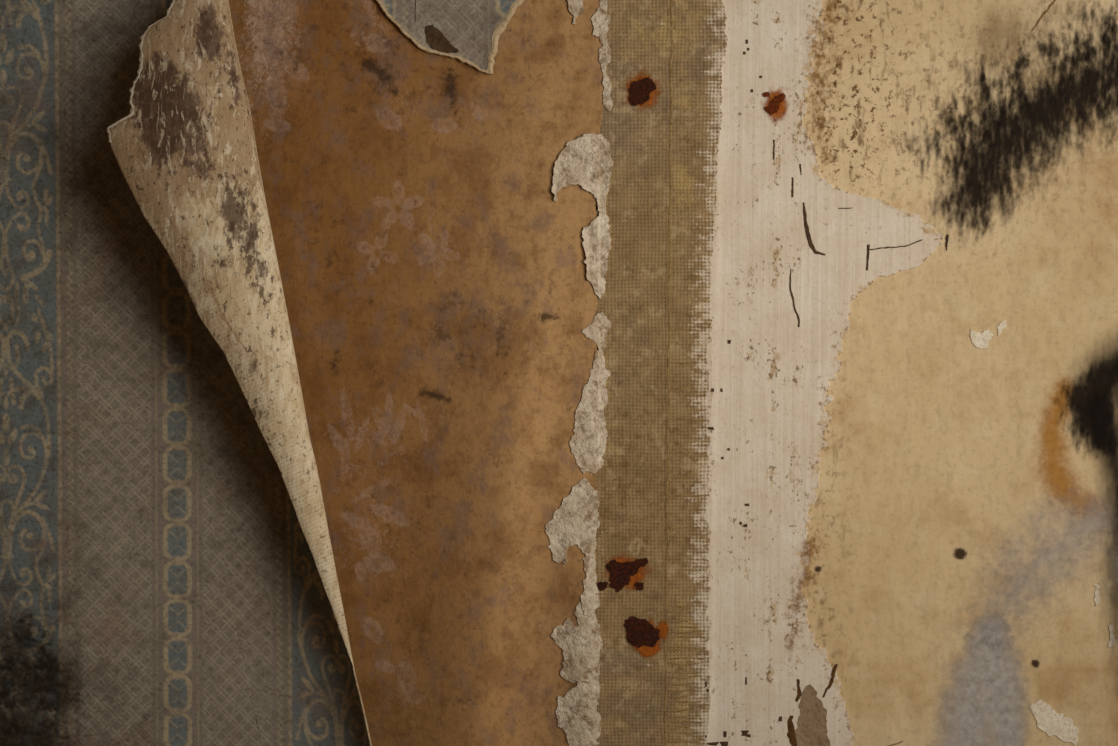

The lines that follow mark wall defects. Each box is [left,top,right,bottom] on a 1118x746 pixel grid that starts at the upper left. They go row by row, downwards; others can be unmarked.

peeling [425,25,459,54]
corrosion [627,72,659,106]
corrosion [763,91,787,121]
peeling [107,0,372,746]
corrosion [598,557,648,592]
corrosion [624,616,668,657]
mould [0,621,74,746]
spalling [778,664,838,746]